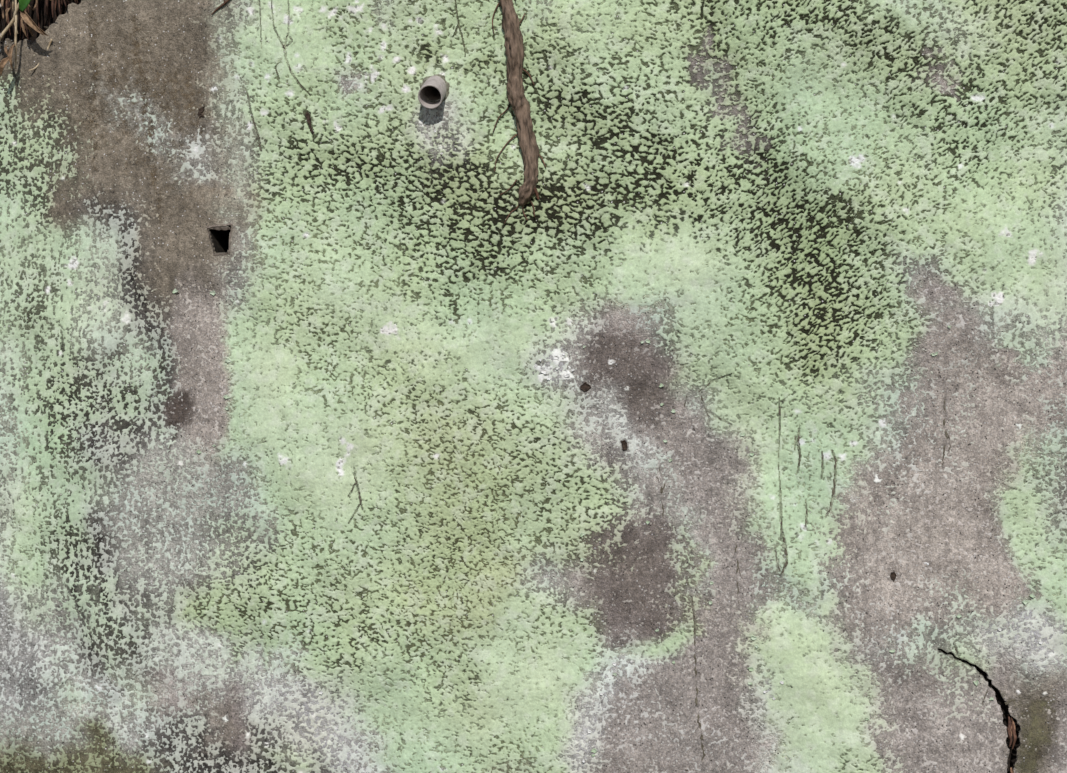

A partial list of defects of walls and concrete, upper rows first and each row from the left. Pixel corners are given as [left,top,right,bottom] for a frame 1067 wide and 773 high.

crack [938,647,1050,773]